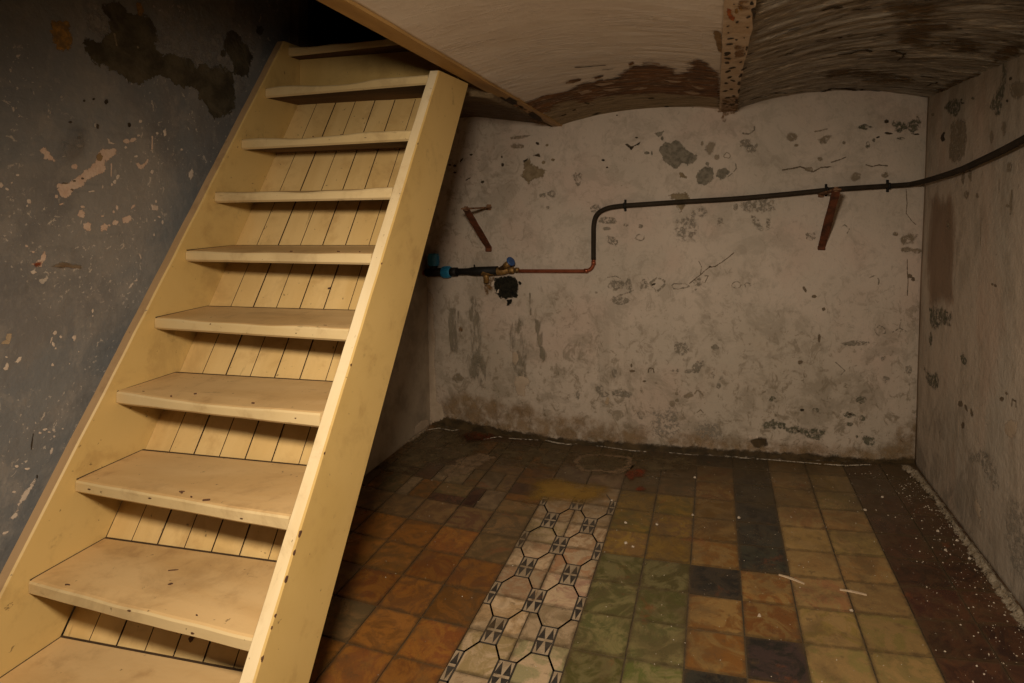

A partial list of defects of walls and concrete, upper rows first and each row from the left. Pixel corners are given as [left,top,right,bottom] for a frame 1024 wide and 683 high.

peeling [500,60,721,127]
peeling [55,120,166,205]
spalling [521,142,555,184]
spalling [625,131,737,185]
spalling [491,275,522,306]
water stain [429,390,915,466]